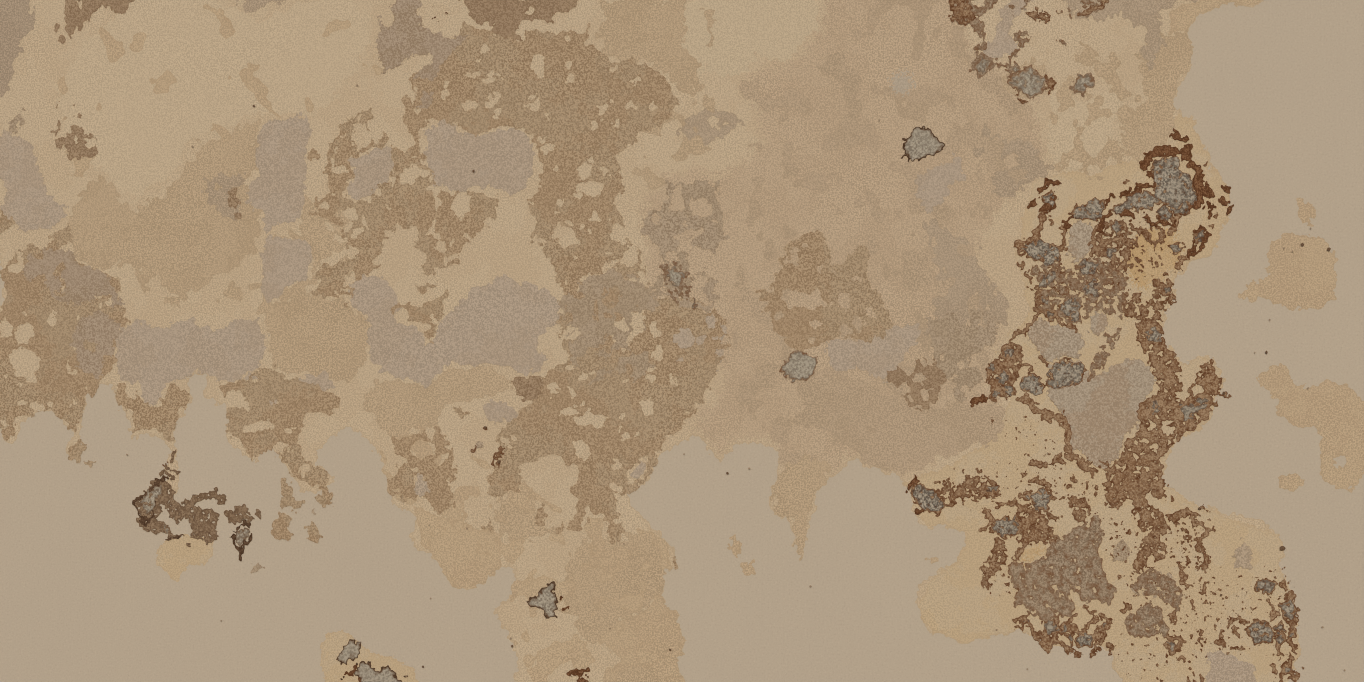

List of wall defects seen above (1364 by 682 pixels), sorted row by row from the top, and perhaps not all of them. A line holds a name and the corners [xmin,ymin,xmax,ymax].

corrosion [948,0,1109,104]
corrosion [901,126,945,162]
peeling [0,0,1198,562]
corrosion [779,350,818,383]
corrosion [906,128,1304,682]
corrosion [132,450,261,561]
corrosion [526,581,569,621]
corrosion [336,639,408,682]
corrosion [566,667,590,682]
peeling [1205,650,1263,682]